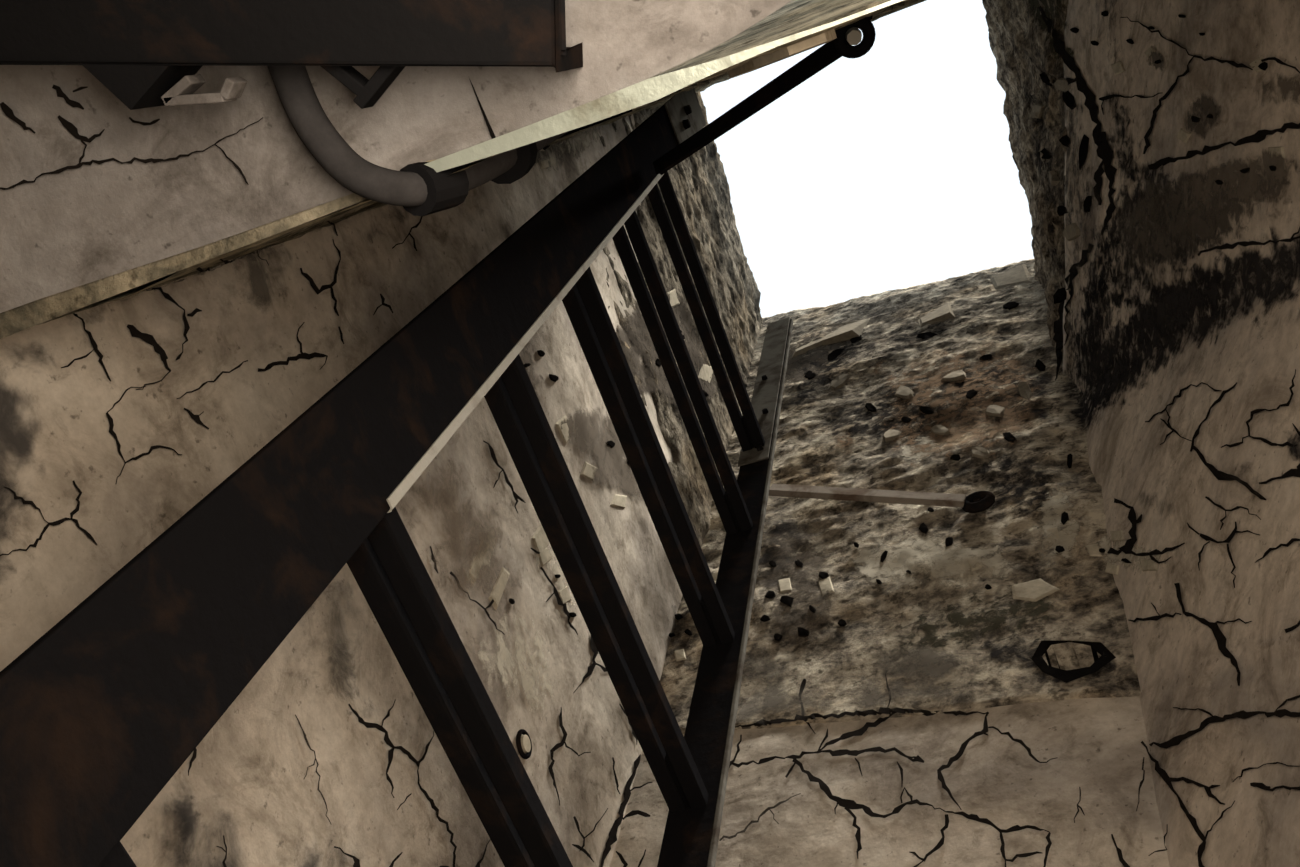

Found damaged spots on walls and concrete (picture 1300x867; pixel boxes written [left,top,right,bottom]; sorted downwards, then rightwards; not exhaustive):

crack [0,84,263,190]
crack [61,217,348,483]
crack [373,294,393,315]
damp [790,66,1300,464]
crack [1038,6,1300,381]
crack [0,481,97,556]
damp [853,528,1068,707]
crack [1107,369,1300,867]
crack [348,699,491,867]
crack [719,673,1085,867]